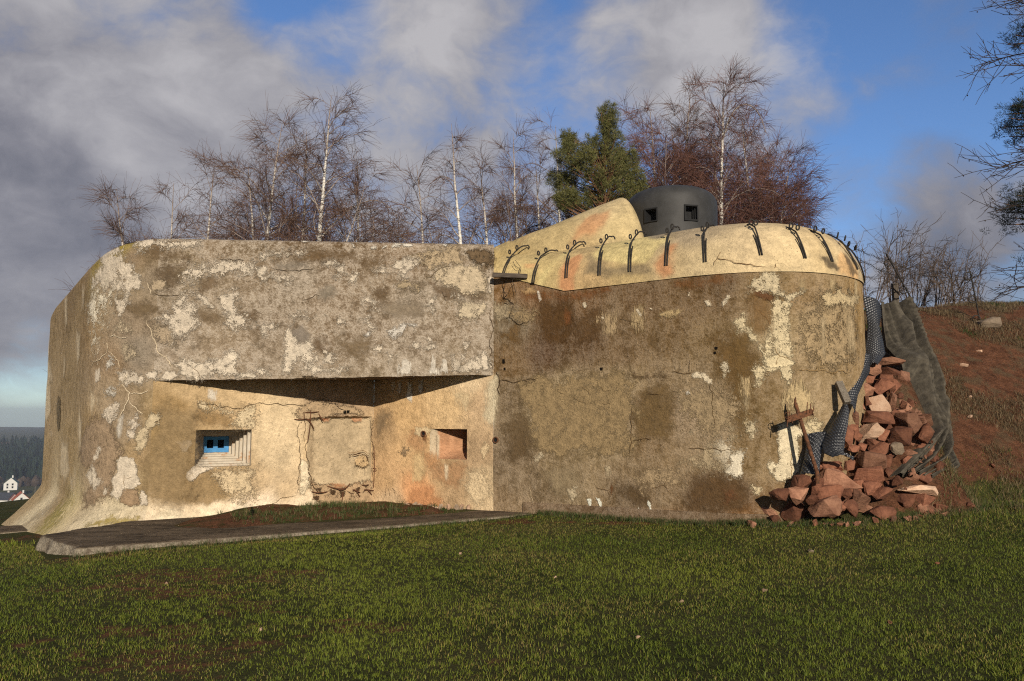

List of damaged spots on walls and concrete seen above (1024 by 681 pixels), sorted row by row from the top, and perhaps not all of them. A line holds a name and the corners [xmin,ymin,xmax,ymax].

peeling [85,401,162,506]
crack [96,321,200,415]
peeling [84,239,351,387]
spalling [294,399,377,504]
crack [488,281,660,449]
damp [533,291,653,344]
damp [632,374,690,443]
peeling [666,271,860,482]